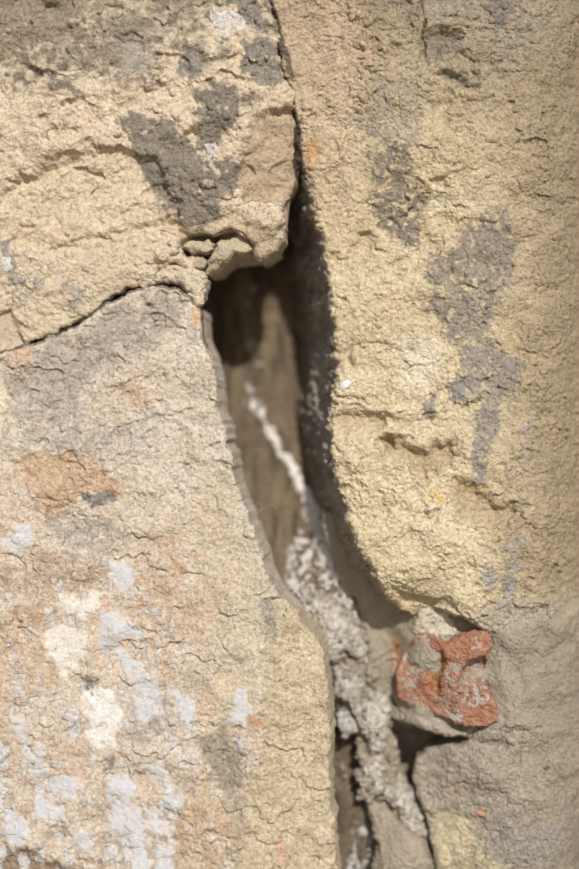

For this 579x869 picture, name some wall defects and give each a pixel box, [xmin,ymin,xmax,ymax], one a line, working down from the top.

crack [269,0,308,186]
crack [416,0,427,57]
crack [0,229,256,368]
crack [500,724,543,732]